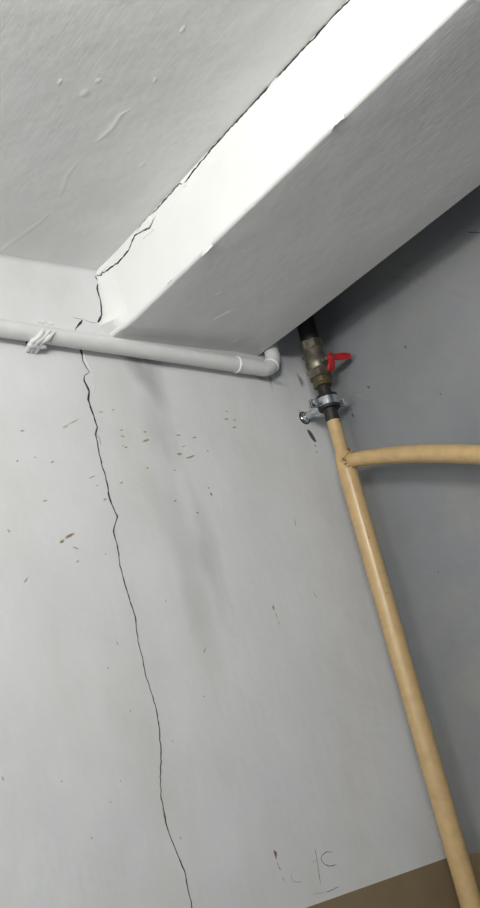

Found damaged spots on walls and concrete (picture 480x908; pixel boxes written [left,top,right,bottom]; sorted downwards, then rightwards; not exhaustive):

crack [72,0,350,908]